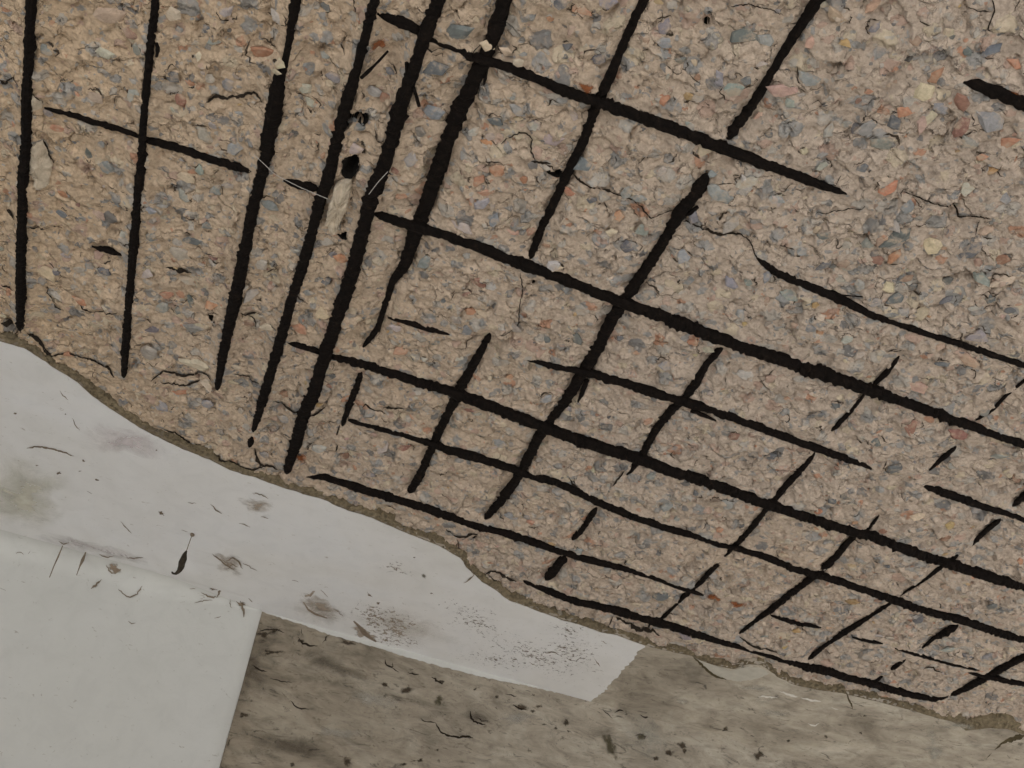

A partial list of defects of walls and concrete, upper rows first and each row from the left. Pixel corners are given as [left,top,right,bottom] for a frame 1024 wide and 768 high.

crack [206,91,262,103]
spalling [15,0,37,331]
spalling [214,0,301,391]
spalling [251,0,431,432]
crack [501,132,758,259]
crack [904,192,989,236]
crack [1,319,114,377]
crack [163,429,277,471]
crack [151,371,340,451]
spalling [283,0,1024,596]
spalling [348,398,1024,643]
spalling [523,580,949,702]